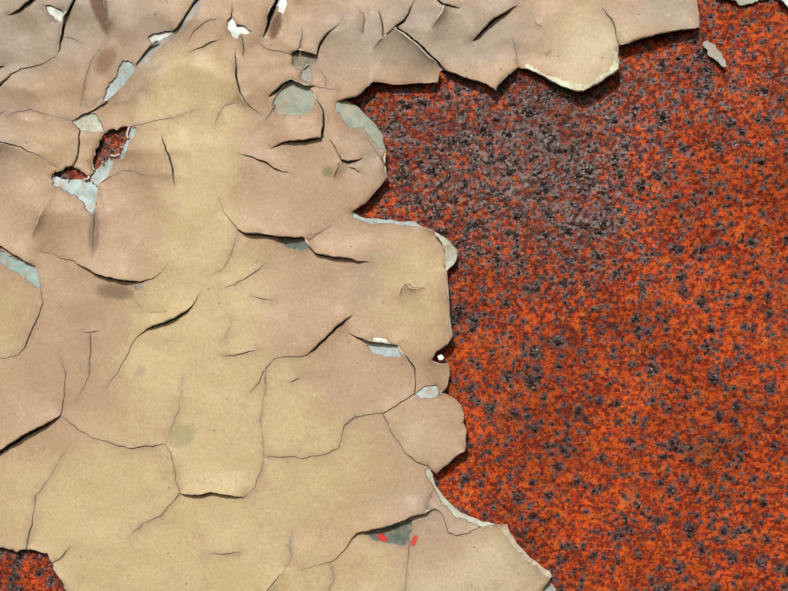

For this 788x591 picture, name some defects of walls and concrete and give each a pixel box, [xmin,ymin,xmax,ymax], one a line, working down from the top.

peeling [73,113,104,134]
corrosion [49,123,131,191]
peeling [52,128,137,214]
crack [0,0,554,293]
peeling [273,52,318,116]
peeling [335,0,700,155]
peeling [0,251,41,287]
corrosion [341,0,788,591]
crack [0,183,483,591]
peeling [348,165,556,591]
corrosion [0,544,69,591]